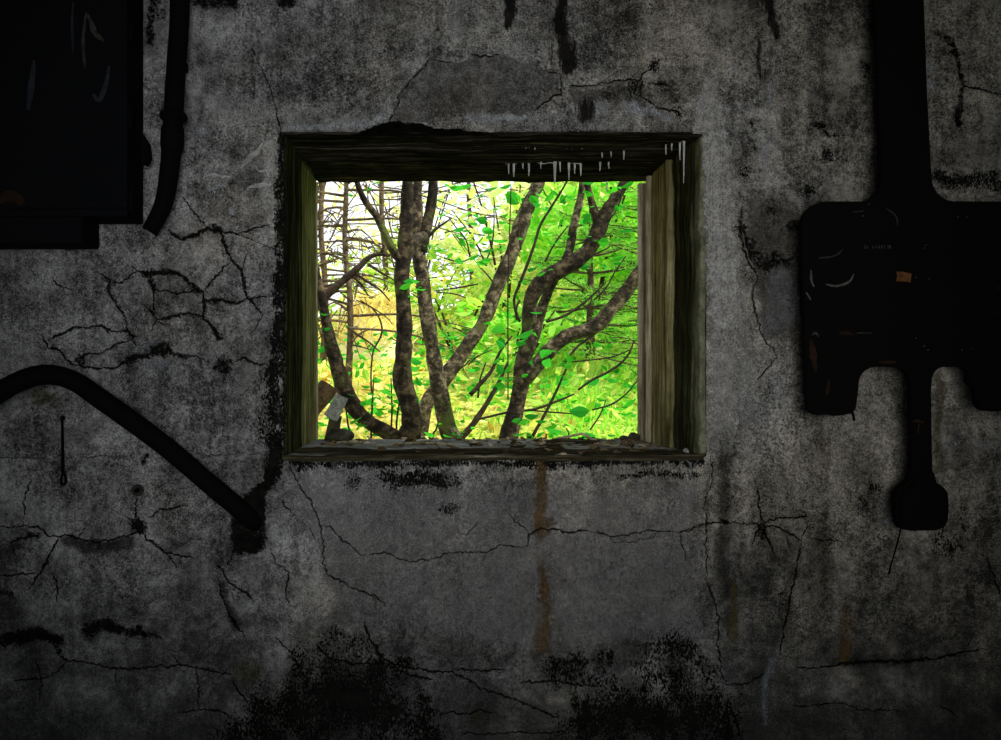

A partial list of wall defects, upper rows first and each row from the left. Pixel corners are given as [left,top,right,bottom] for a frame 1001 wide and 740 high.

leakage [503,0,518,30]
leakage [549,0,577,76]
crack [534,63,681,117]
leakage [575,58,686,124]
crack [40,196,273,370]
crack [738,230,777,380]
leakage [229,113,738,643]
crack [0,457,253,639]
corrosion [535,463,548,536]
crack [276,456,987,740]
mould [206,626,446,740]
mould [540,627,752,740]